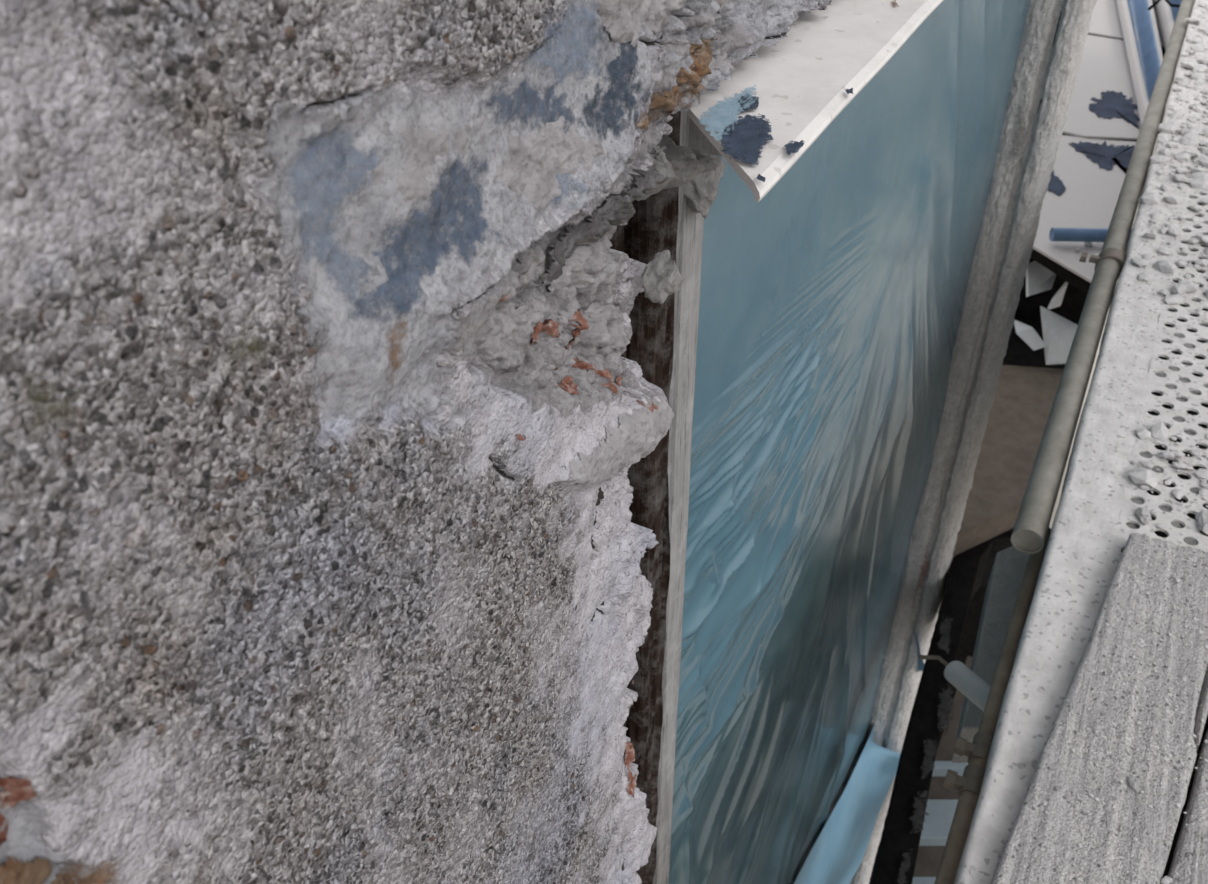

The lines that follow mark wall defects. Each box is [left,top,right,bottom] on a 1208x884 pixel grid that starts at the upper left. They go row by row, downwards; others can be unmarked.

spalling [257,0,829,434]
spalling [624,741,637,797]
spalling [0,771,107,884]